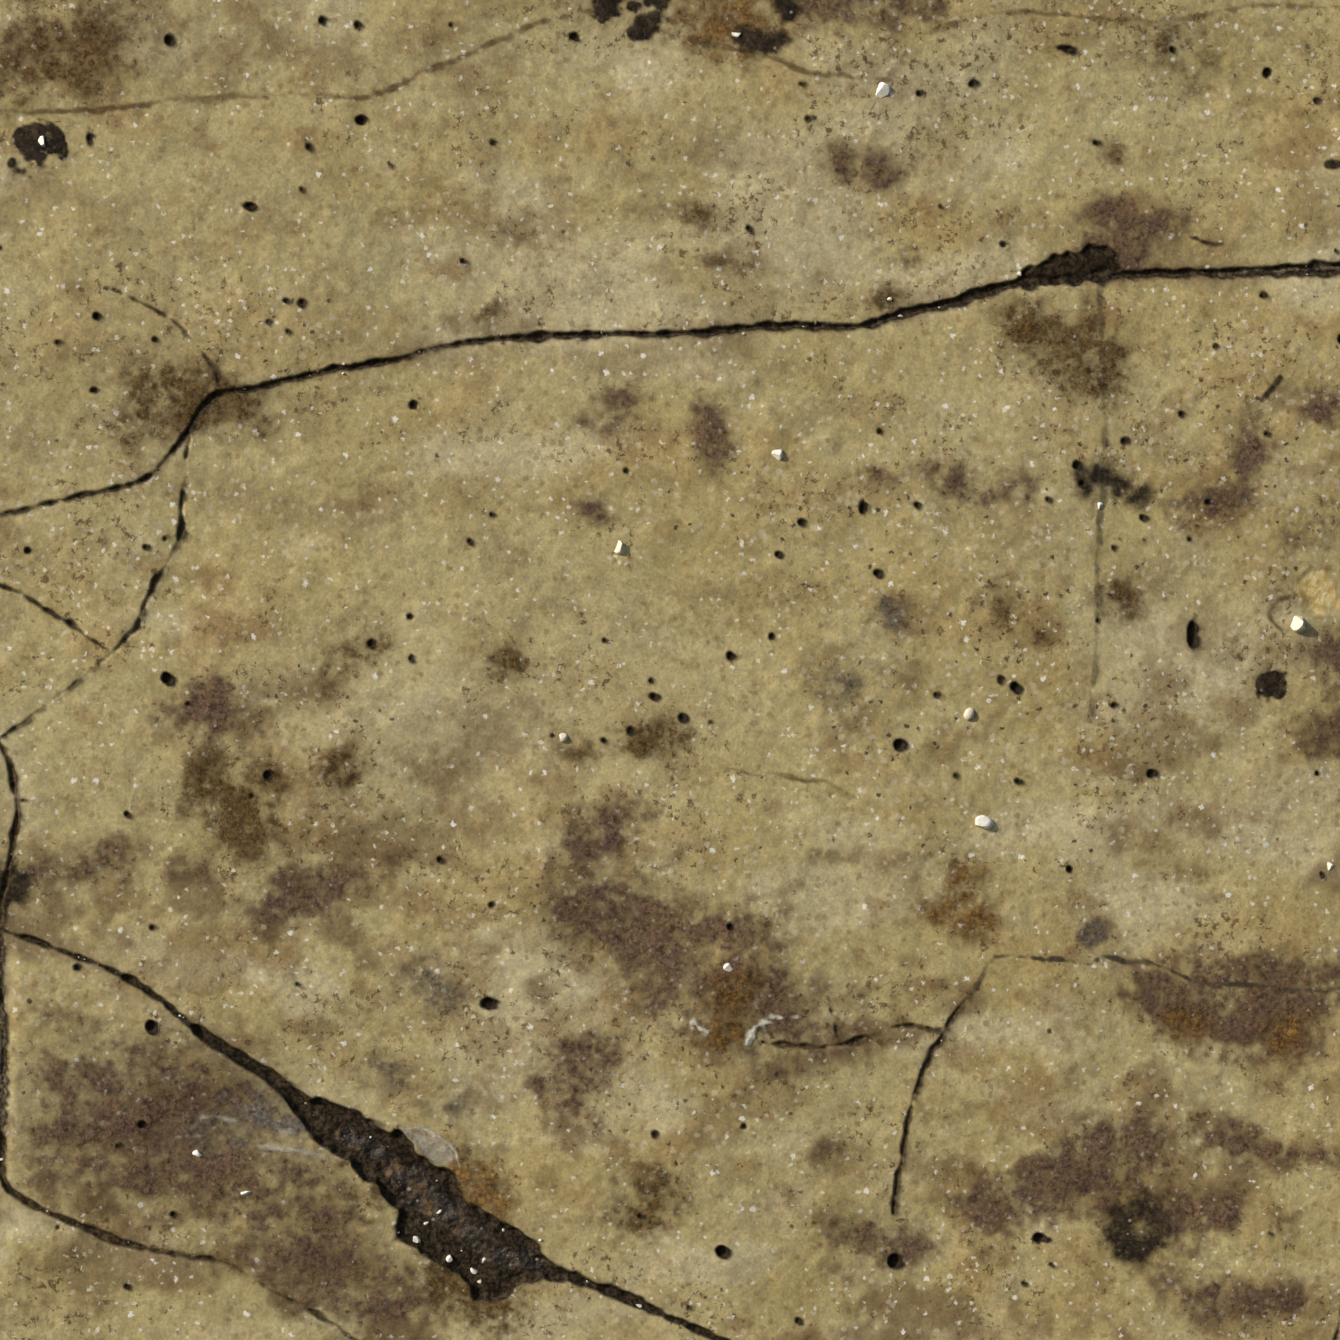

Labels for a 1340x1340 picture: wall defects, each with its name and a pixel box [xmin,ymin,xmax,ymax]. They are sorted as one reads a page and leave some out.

crack [336,9,592,99]
crack [27,102,153,114]
crack [0,244,1340,690]
crack [788,774,812,782]
crack [0,709,730,1340]
crack [1223,980,1254,988]
crack [763,955,1190,1216]
leakage [30,1043,439,1323]
spalling [403,1127,457,1161]
mould [1103,1193,1179,1263]